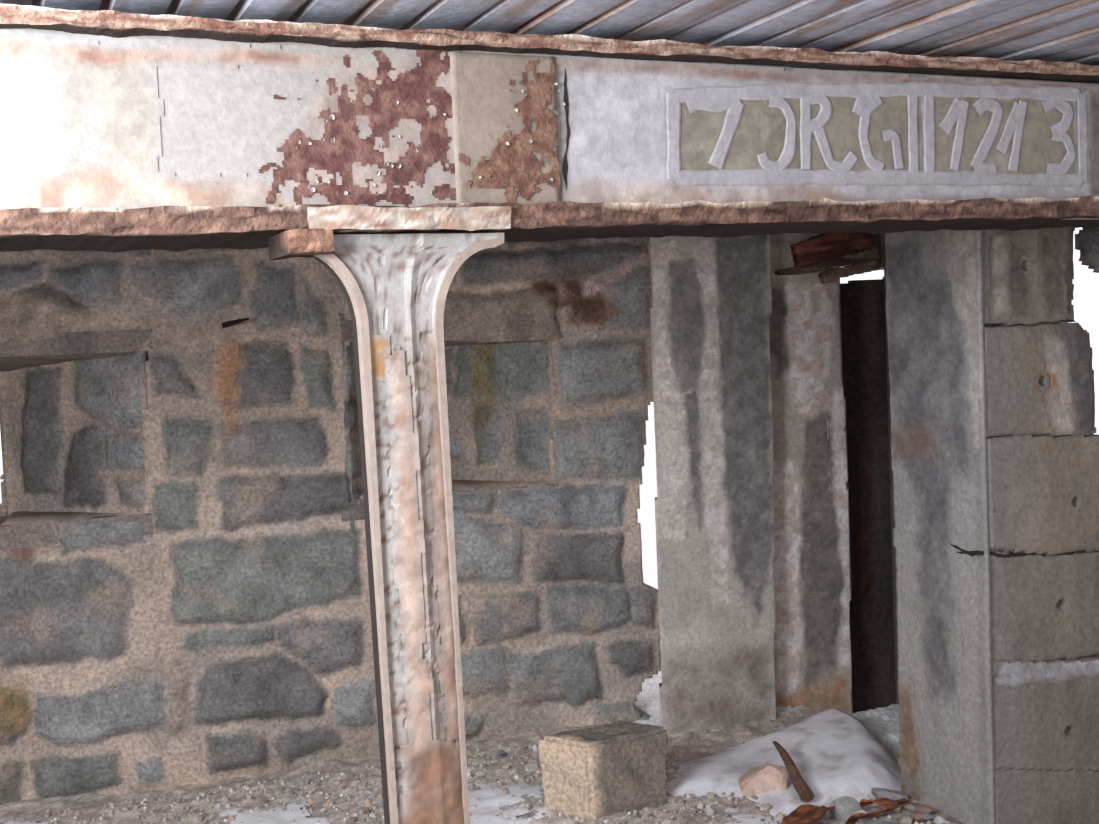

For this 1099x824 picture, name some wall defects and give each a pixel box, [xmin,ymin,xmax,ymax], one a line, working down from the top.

peeling [259,50,565,208]
crack [562,69,570,190]
rust [370,333,464,824]
damp [578,235,852,736]